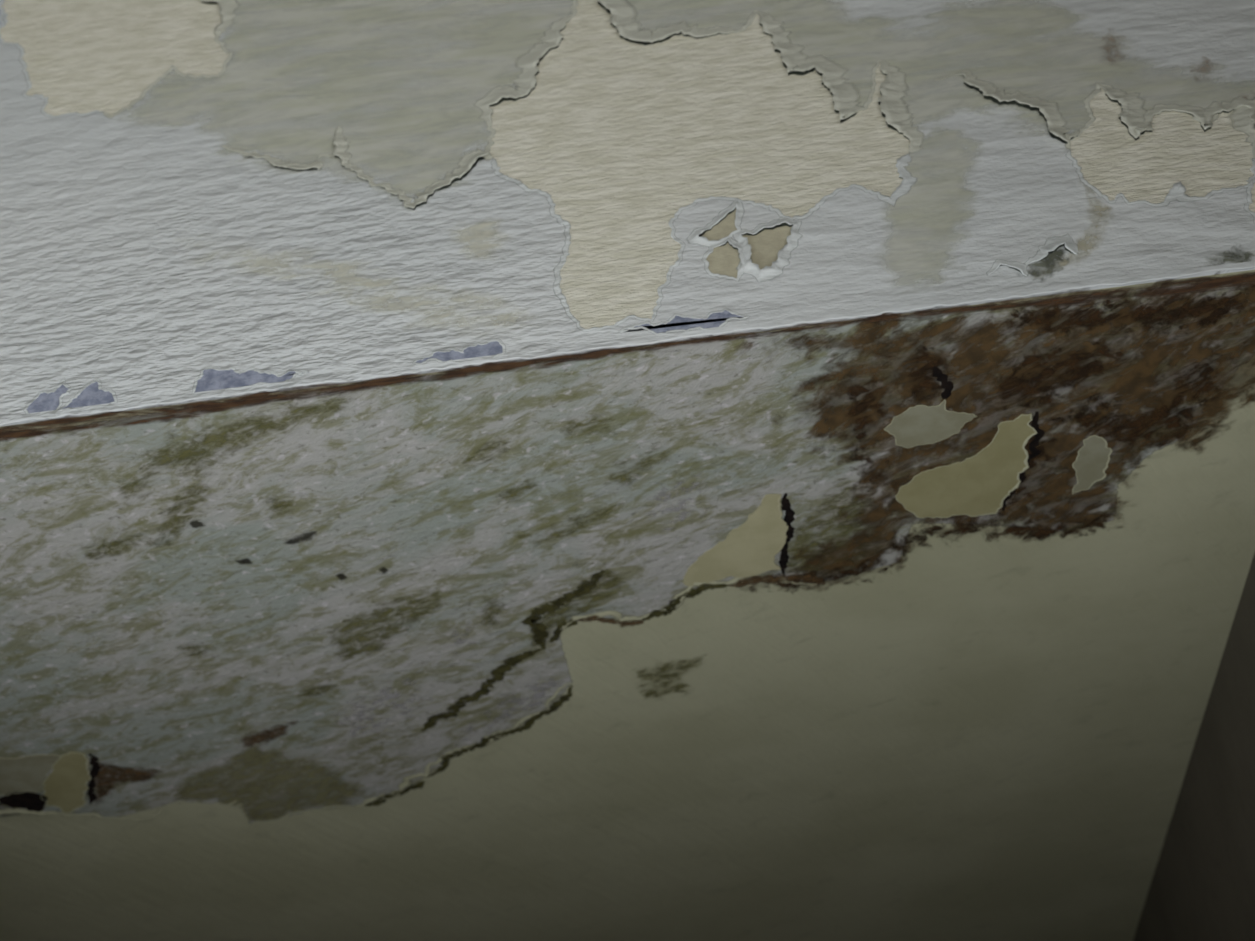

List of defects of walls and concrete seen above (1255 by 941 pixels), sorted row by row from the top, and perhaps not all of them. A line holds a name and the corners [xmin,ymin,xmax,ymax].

peeling [0,0,239,118]
peeling [222,0,923,335]
peeling [934,70,1255,224]
peeling [987,235,1078,276]
leakage [121,402,340,542]
leakage [750,279,1255,591]
leakage [88,536,137,558]
leakage [286,532,316,544]
peeling [0,282,1255,824]
leakage [333,594,437,657]
leakage [639,660,700,697]
leakage [178,746,357,819]